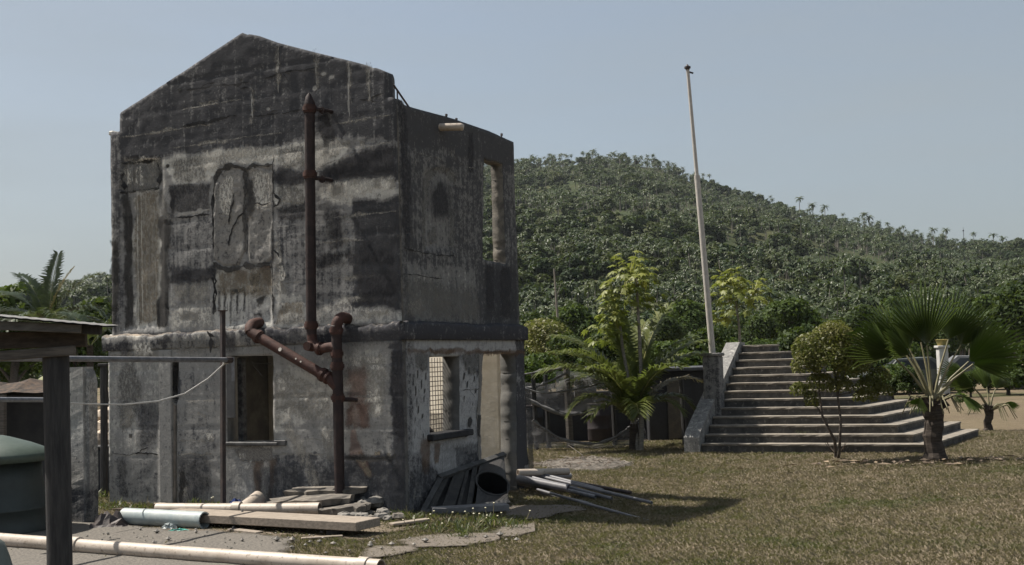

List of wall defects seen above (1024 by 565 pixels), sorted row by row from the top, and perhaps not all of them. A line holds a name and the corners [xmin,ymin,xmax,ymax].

water stain [169,183,210,217]
crack [207,150,281,353]
water stain [316,207,396,304]
water stain [325,100,416,251]